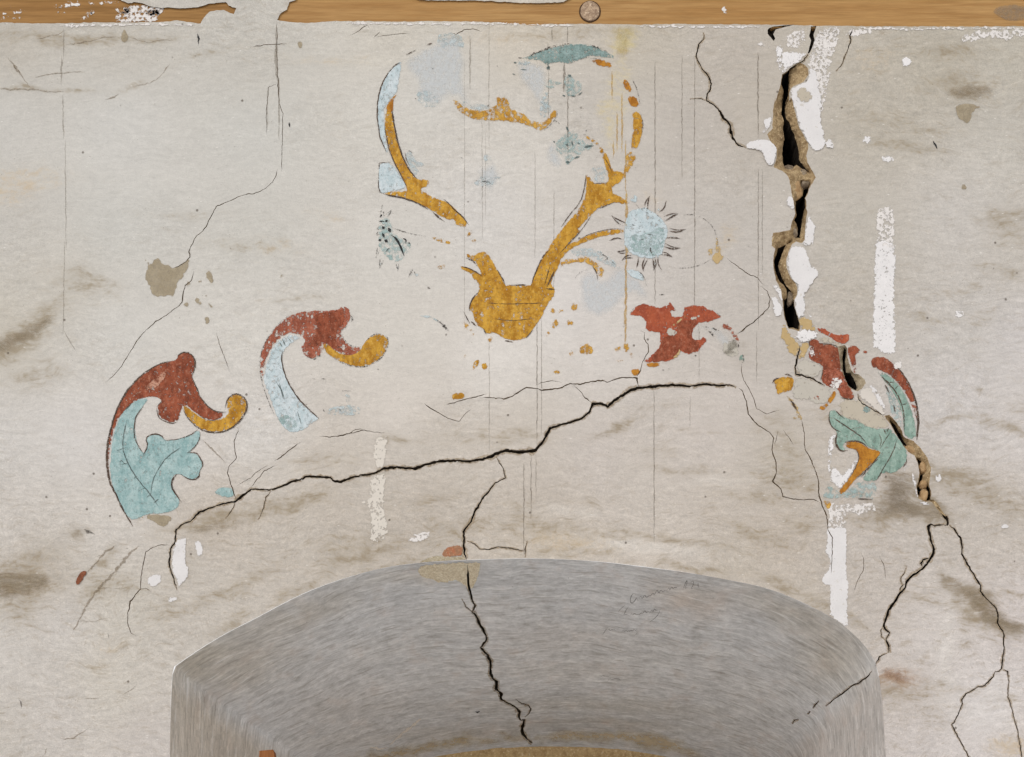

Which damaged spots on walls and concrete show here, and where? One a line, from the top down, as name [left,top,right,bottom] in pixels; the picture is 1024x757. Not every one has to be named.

crack [111,26,283,378]
crack [127,332,833,745]
peeling [771,297,817,359]
crack [730,25,1023,757]